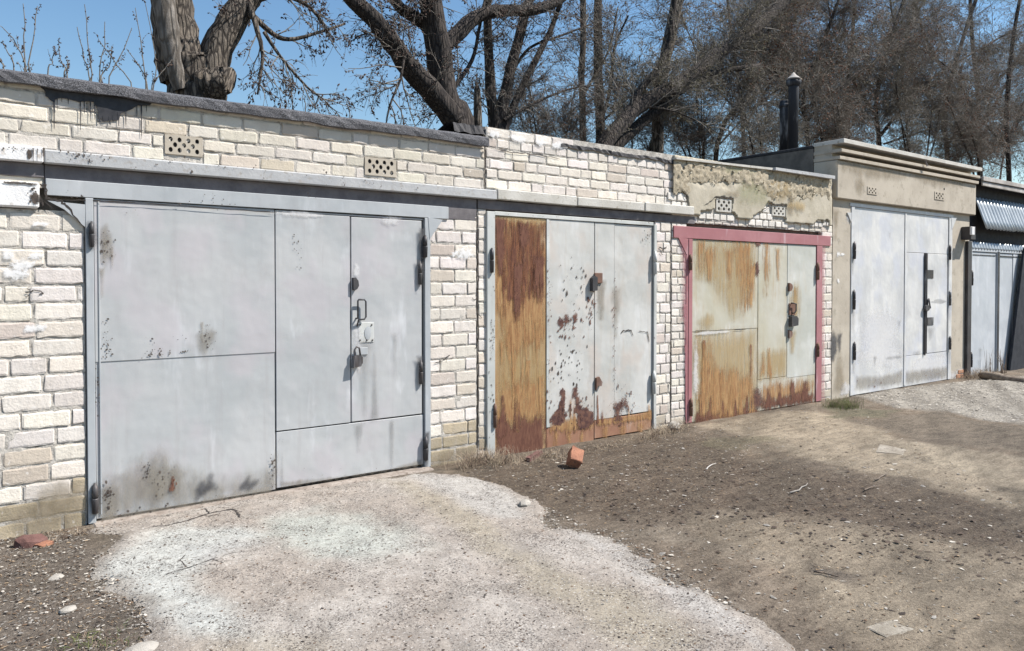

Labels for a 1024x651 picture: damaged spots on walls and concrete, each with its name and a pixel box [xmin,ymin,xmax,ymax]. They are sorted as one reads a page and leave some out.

leakage [41,87,151,138]
flaking render [667,158,831,229]
rust [696,239,780,312]
rust [495,216,652,462]
rust [695,316,815,423]